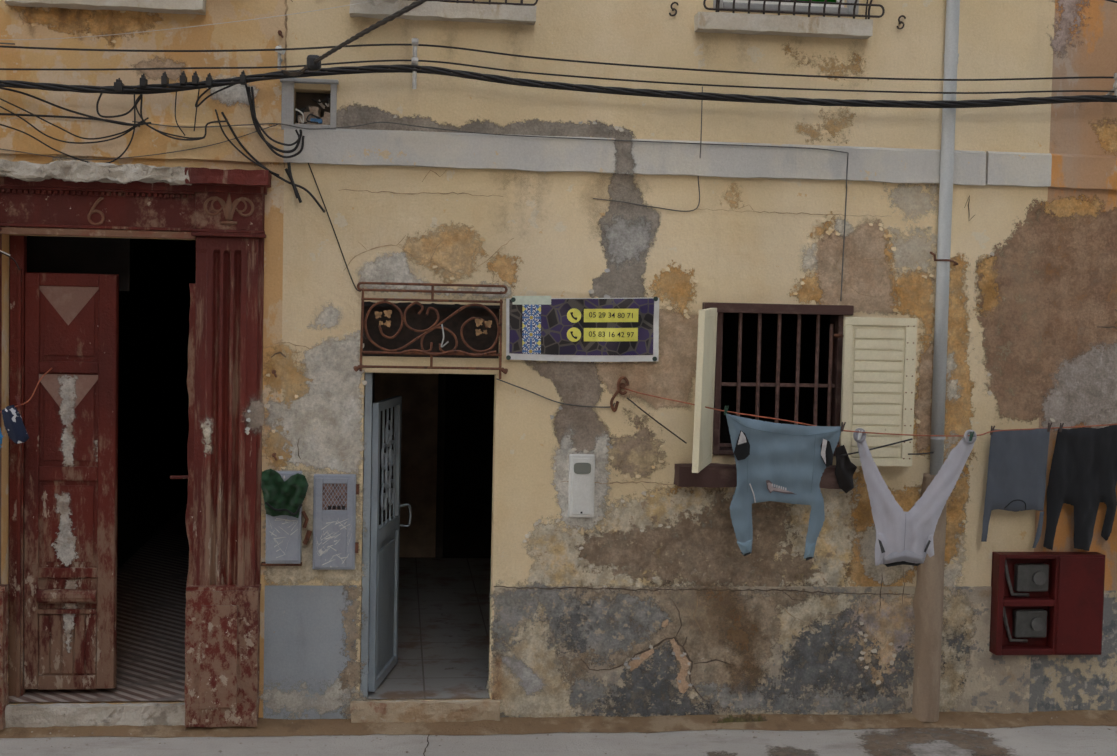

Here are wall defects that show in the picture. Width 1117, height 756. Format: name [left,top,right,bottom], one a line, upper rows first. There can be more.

peeling [402,222,524,288]
peeling [790,194,1117,464]
peeling [243,331,367,474]
spalling [522,259,922,709]
peeling [944,447,975,567]
peeling [487,602,579,718]
crack [494,569,910,700]